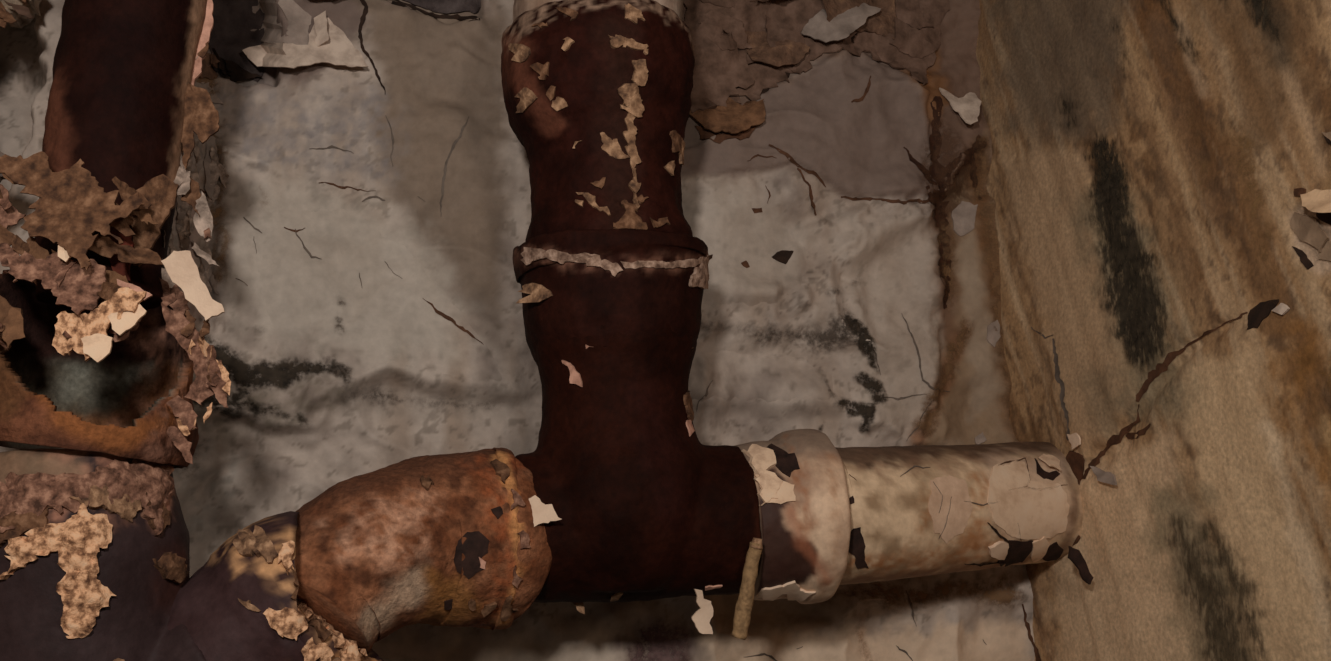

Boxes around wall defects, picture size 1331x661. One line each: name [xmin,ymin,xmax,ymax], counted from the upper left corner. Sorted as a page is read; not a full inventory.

flaking render [0,0,41,28]
peeling [194,0,368,104]
flaking render [684,0,982,144]
peeling [161,133,229,321]
leakage [1085,134,1167,370]
peeling [1290,188,1331,269]
leakage [192,337,347,422]
leakage [755,315,887,432]
crack [871,312,1248,567]
leakage [1168,517,1263,661]